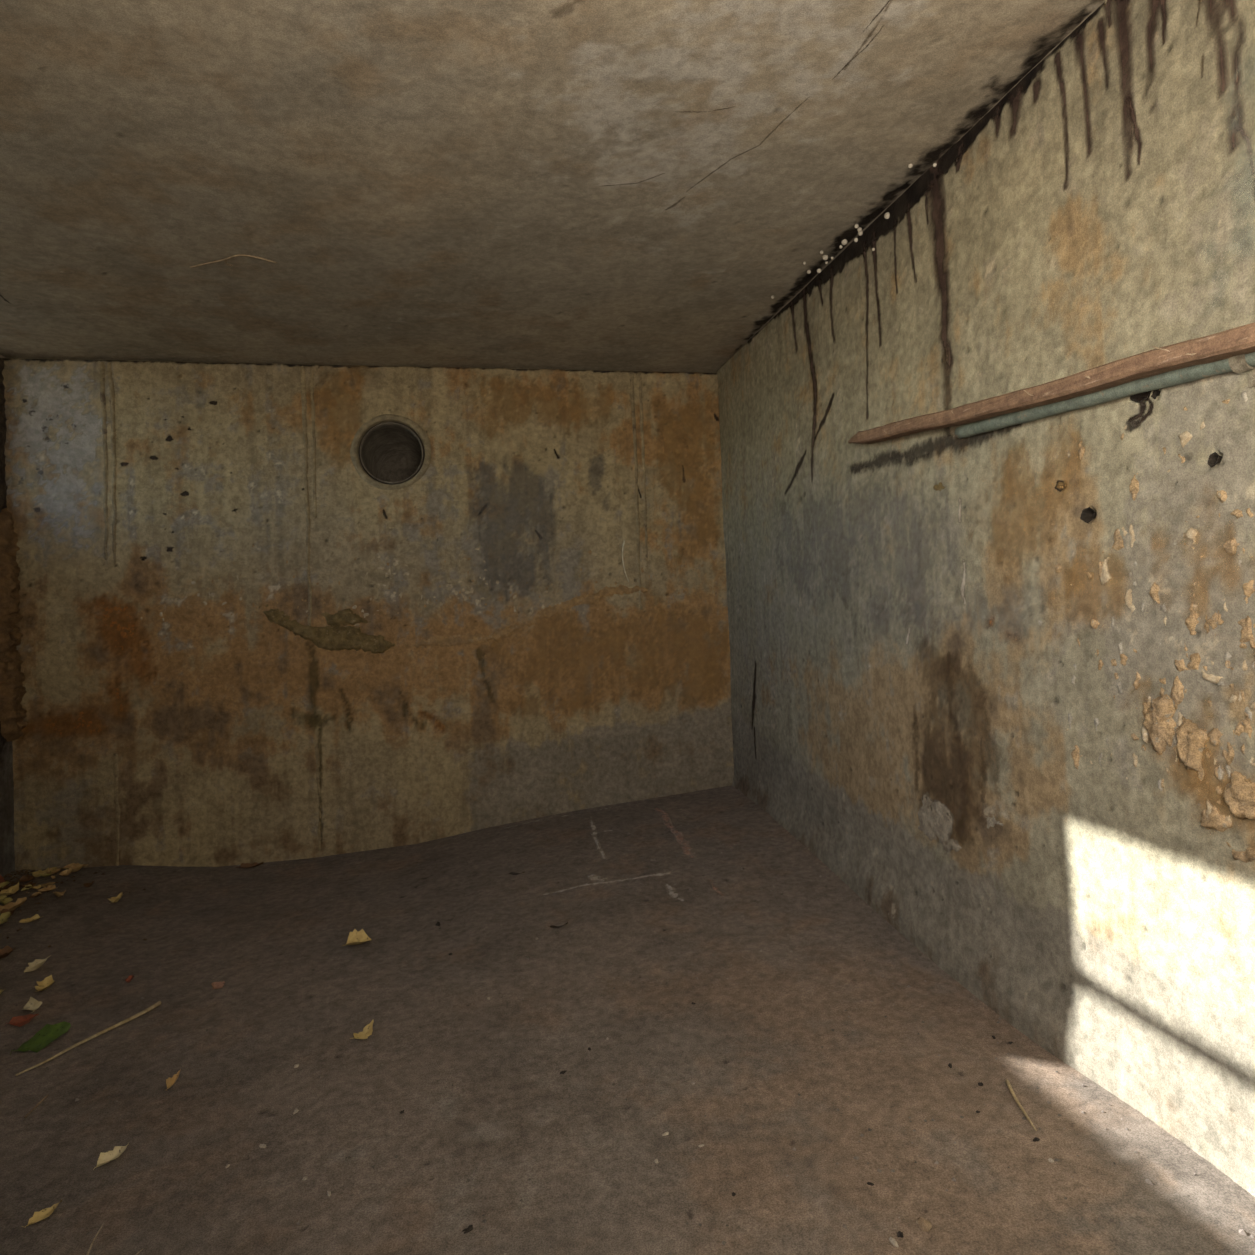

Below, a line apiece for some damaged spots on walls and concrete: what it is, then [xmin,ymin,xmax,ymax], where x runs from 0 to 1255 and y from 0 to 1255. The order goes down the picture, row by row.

crack [834,0,890,78]
leakage [1196,0,1255,182]
crack [606,99,807,210]
leakage [730,0,1167,481]
flaking render [1163,421,1205,472]
peeling [1173,516,1199,549]
peeling [1216,490,1254,567]
spalling [153,547,598,655]
peeling [1087,524,1255,826]